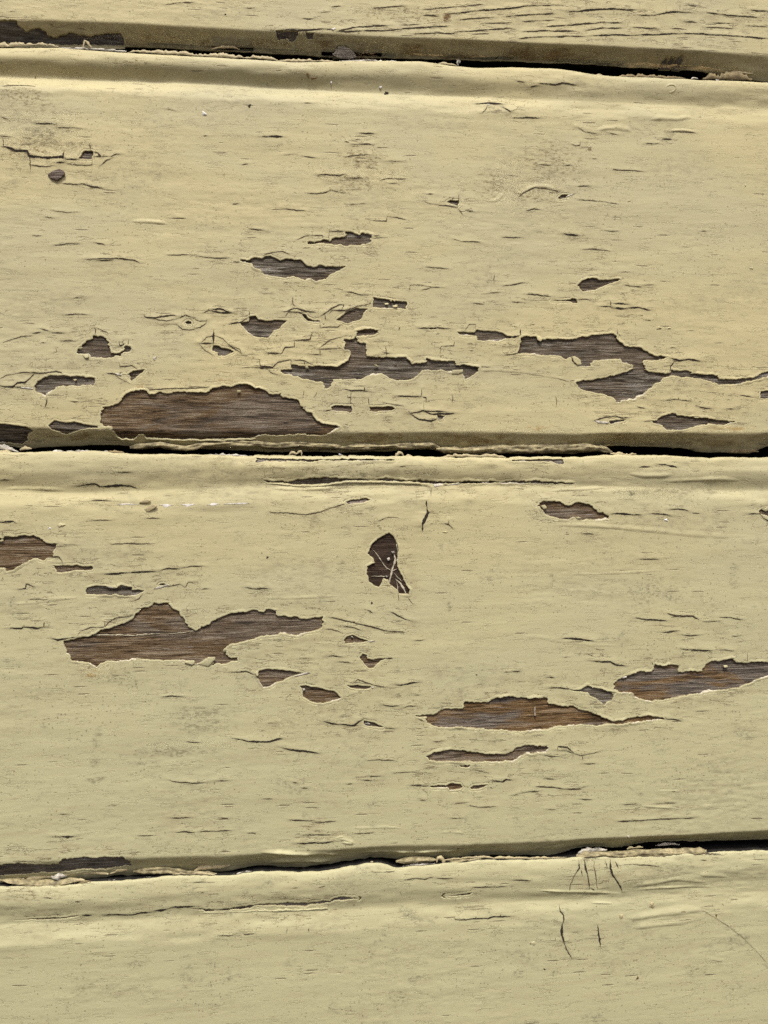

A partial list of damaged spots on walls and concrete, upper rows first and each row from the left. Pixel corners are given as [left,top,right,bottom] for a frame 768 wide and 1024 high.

peeling [238,229,375,285]
peeling [74,333,134,361]
peeling [238,295,482,392]
peeling [455,327,768,405]
peeling [0,367,355,447]
peeling [649,410,737,433]
peeling [253,455,612,522]
peeling [0,533,327,670]
peeling [364,530,413,598]
peeling [413,655,768,793]
crack [559,860,659,958]